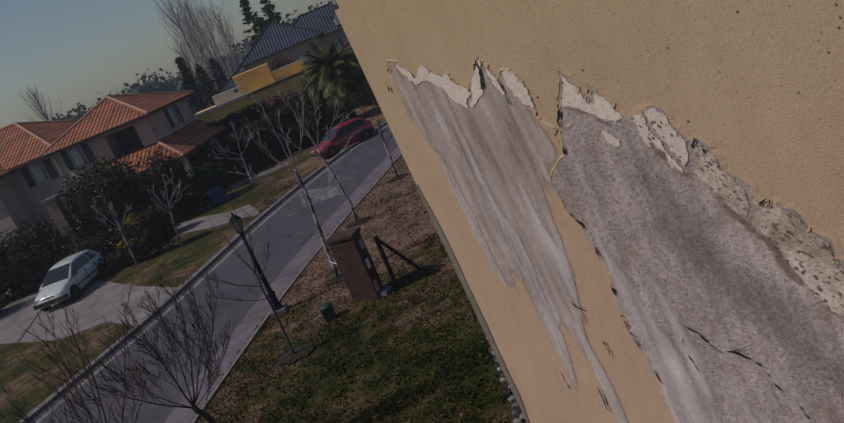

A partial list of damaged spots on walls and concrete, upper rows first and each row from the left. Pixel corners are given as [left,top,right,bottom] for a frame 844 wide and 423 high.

peeling [383,55,844,423]
crack [682,324,810,420]